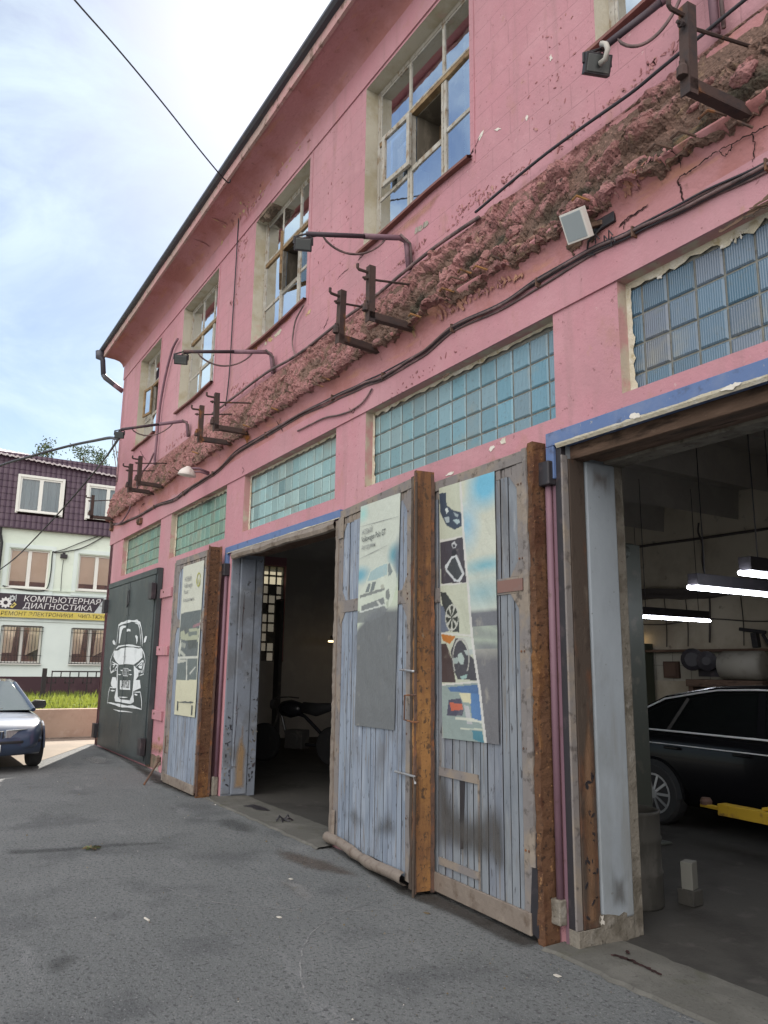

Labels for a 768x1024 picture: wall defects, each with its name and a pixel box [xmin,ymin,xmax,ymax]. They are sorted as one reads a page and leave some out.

spalling [105,3,768,522]
crack [669,125,768,201]
rust [194,546,220,798]
rust [412,470,434,893]
rust [526,441,560,947]